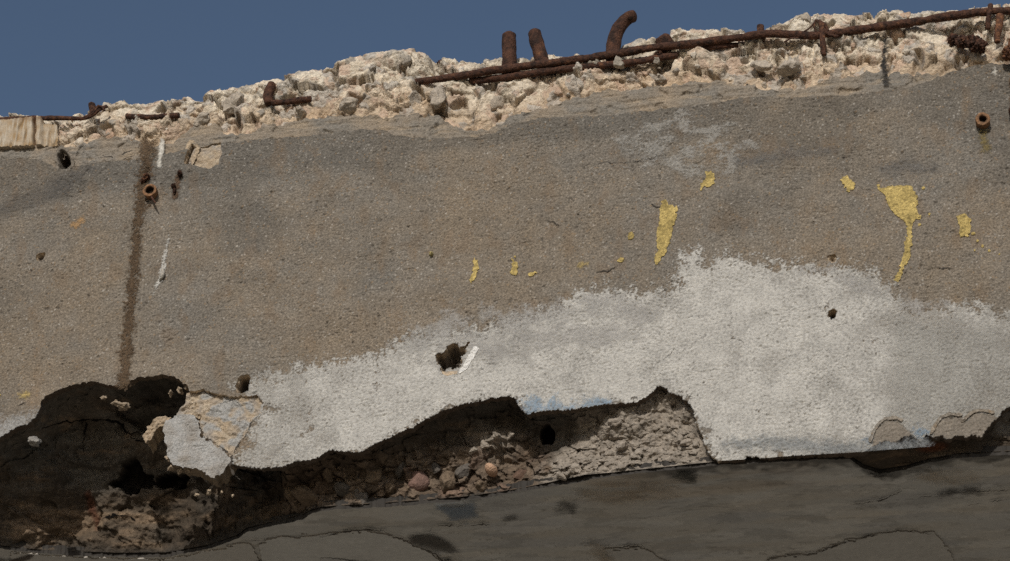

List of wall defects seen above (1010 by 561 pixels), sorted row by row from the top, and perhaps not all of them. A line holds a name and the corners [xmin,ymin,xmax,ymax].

spalling [414,3,1010,85]
spalling [263,81,312,106]
spalling [0,105,108,121]
spalling [125,112,180,120]
peeling [0,244,1010,561]
crack [42,419,146,451]